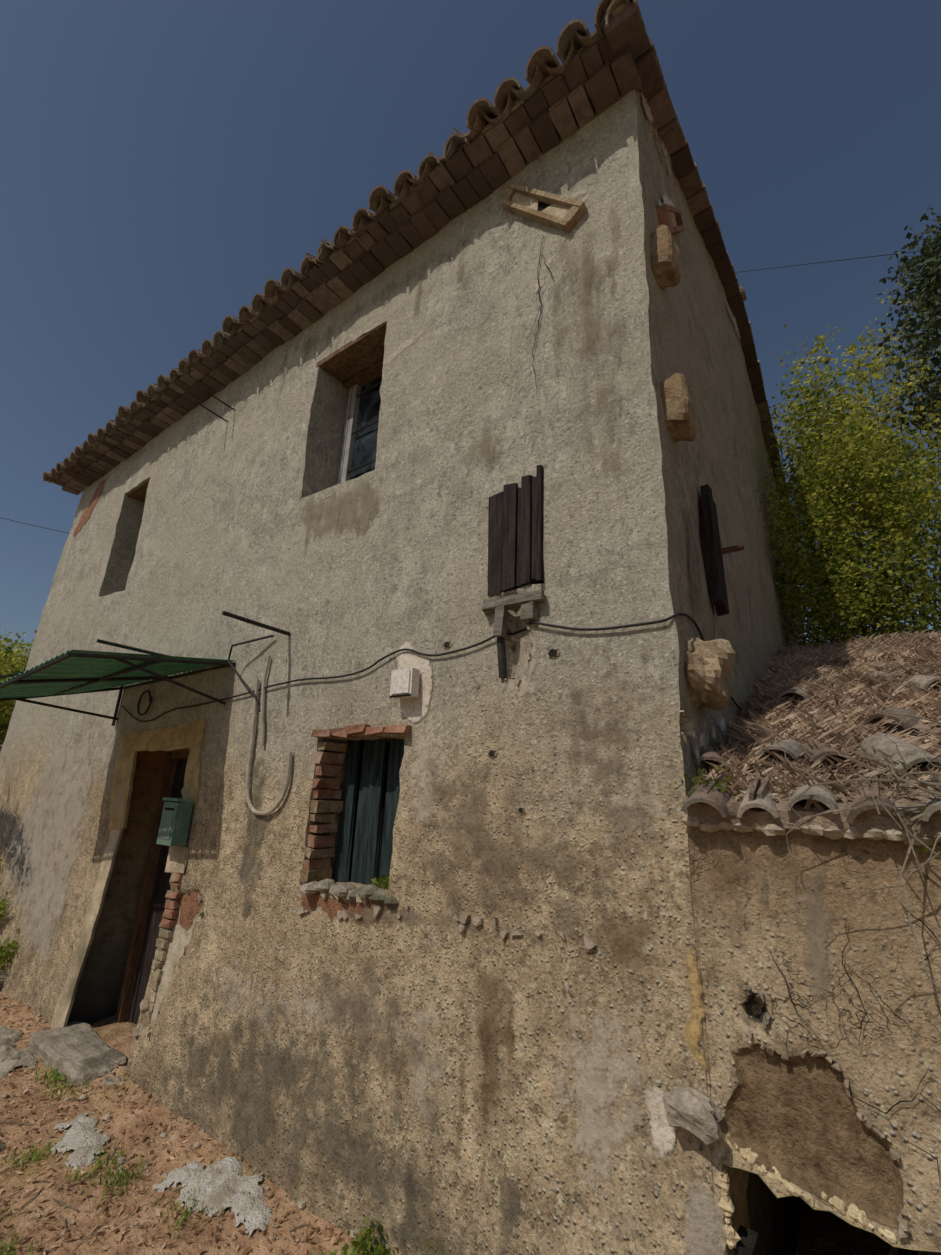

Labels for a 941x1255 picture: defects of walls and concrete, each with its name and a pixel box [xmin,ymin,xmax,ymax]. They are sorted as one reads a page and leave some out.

crack [526,236,554,387]
spalling [132,887,204,1037]
water stain [161,960,451,1247]
water stain [555,1013,652,1186]
peeling [721,986,910,1244]
water stain [500,1178,519,1255]
spalling [717,1167,741,1249]